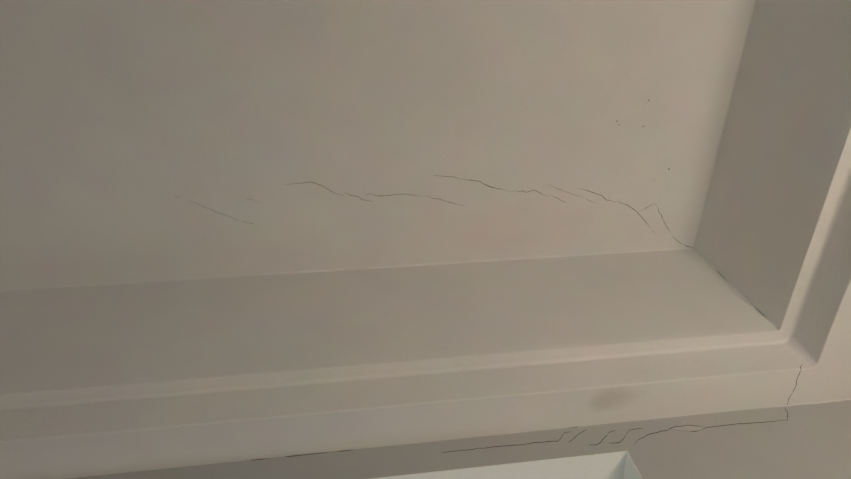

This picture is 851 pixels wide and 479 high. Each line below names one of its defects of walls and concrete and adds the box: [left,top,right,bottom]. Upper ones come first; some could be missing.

crack [441,365,802,453]